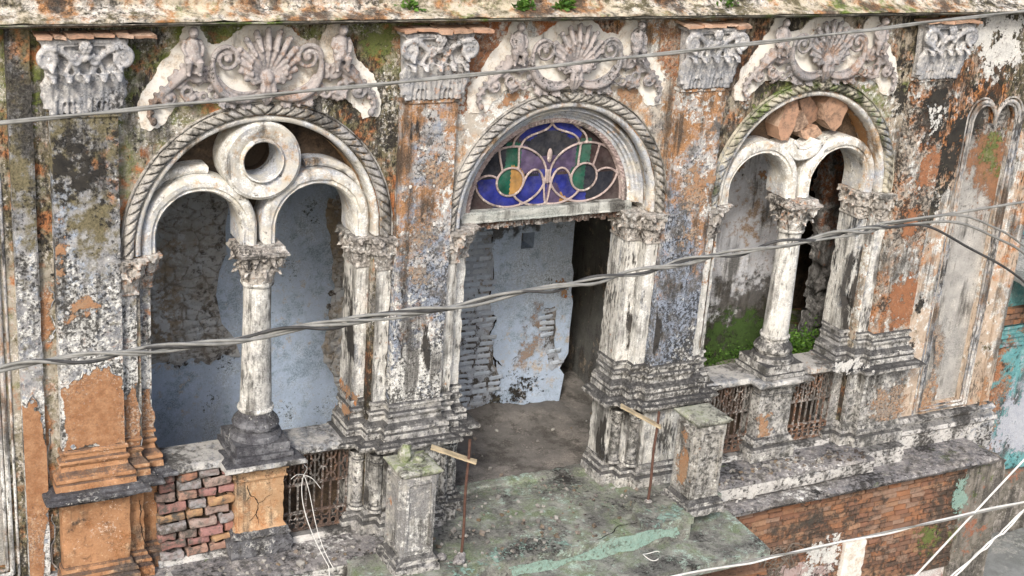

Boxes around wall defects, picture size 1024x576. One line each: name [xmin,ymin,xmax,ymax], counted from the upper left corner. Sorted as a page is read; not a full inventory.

flaking render [458,230,503,410]
flaking render [539,278,573,371]
peeling [882,272,918,329]
peeling [979,356,1009,413]
peeling [22,363,156,576]